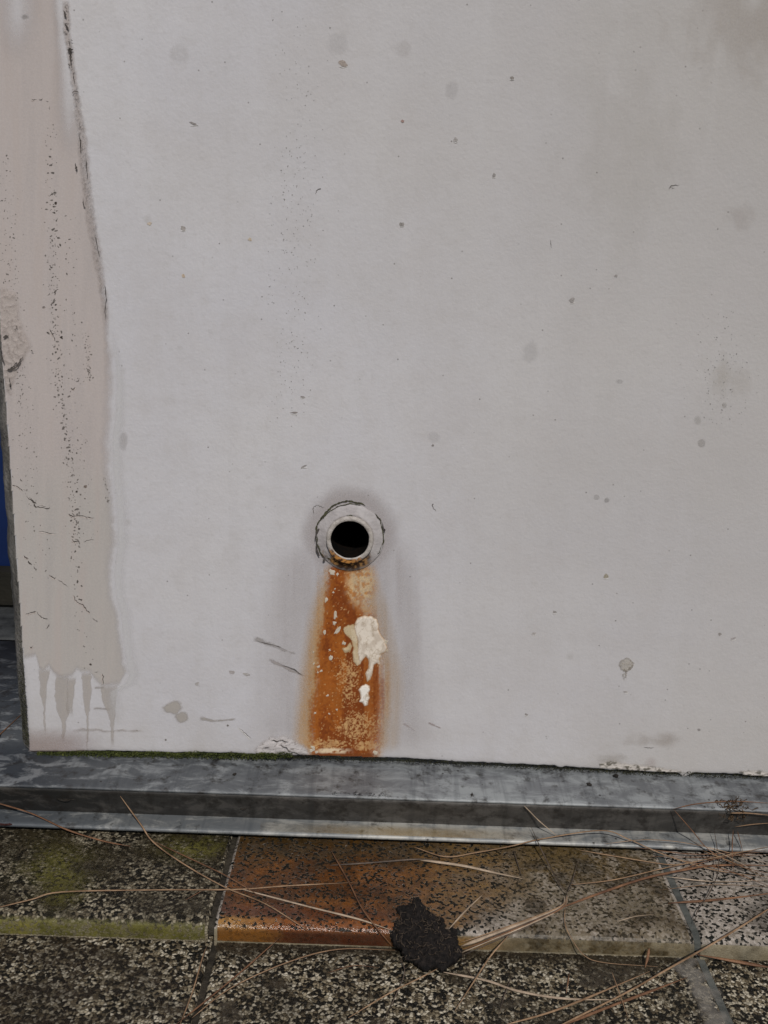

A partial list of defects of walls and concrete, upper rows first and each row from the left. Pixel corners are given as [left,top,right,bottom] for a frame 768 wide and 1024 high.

water stain [0,0,135,740]
rust [299,550,384,757]